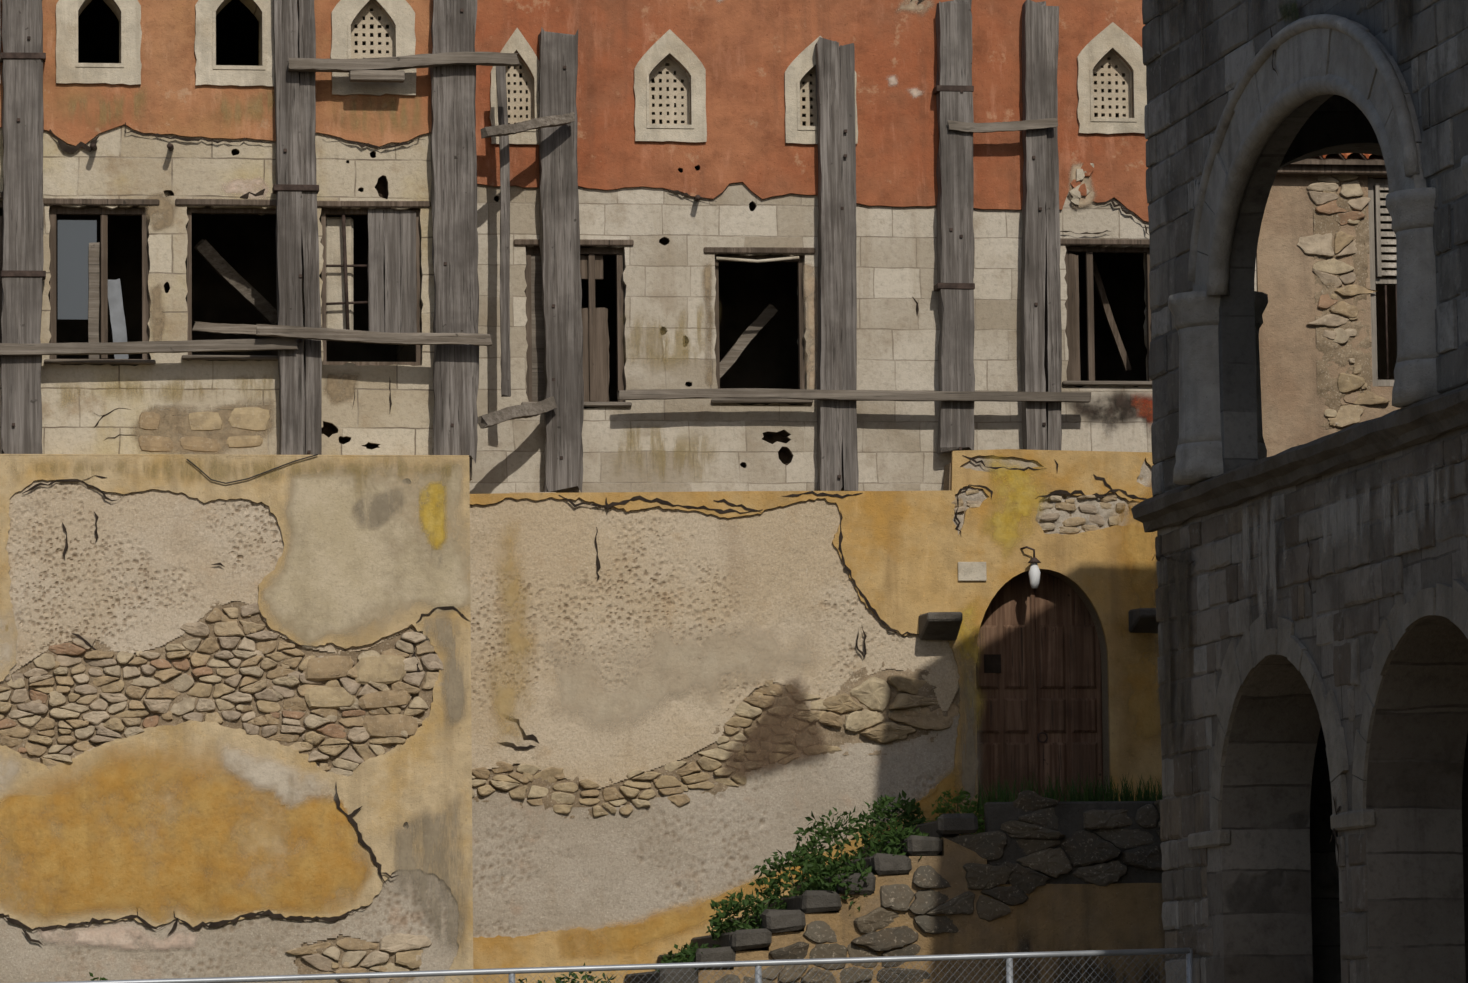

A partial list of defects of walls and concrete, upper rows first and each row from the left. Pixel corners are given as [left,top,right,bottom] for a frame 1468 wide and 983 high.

spalling [358,176,388,199]
flaking render [952,456,1043,535]
flaking render [1036,460,1152,535]
flaking render [0,480,960,983]
crack [0,784,398,945]